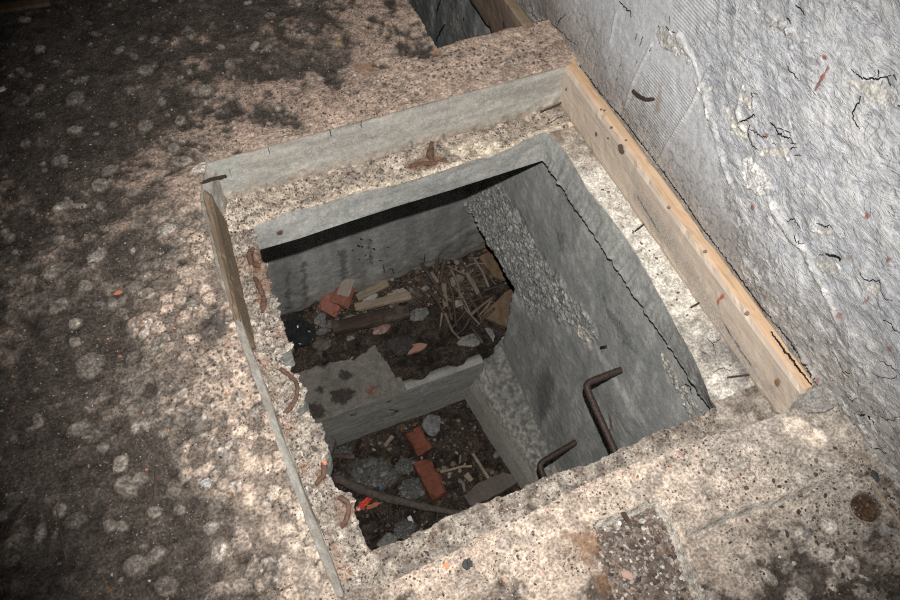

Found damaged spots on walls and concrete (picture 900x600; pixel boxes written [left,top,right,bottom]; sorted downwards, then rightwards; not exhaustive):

crack [851,69,900,129]
crack [551,1,816,383]
crack [787,218,841,262]
spalling [246,161,710,472]
crack [860,273,900,333]
spalling [314,461,327,486]
spalling [338,495,351,529]